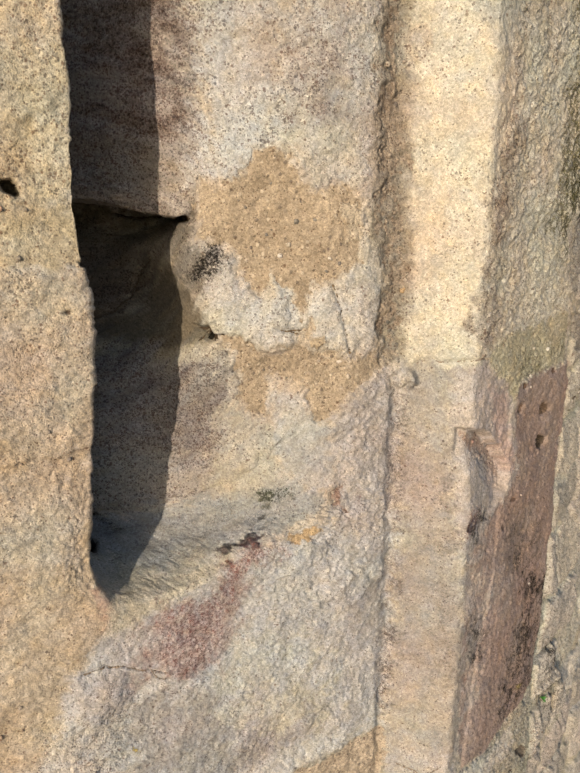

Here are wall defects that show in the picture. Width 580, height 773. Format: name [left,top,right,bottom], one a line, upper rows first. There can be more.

flaking render [191,0,415,423]
crack [83,665,170,680]